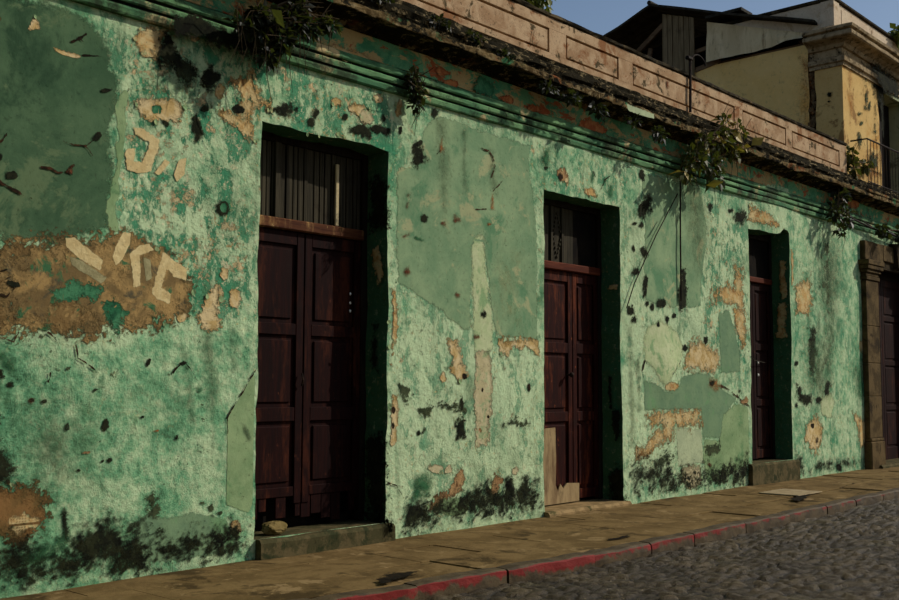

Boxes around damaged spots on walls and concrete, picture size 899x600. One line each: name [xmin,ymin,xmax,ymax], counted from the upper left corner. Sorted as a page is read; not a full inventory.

peeling [133,24,169,64]
peeling [131,92,188,125]
peeling [210,69,273,147]
water stain [367,170,392,234]
peeling [0,224,242,347]
peeling [682,335,720,375]
water stain [0,438,17,487]
water stain [362,423,544,538]
water stain [608,376,621,442]
peeling [634,405,704,464]
water stain [603,441,750,502]
water stain [0,490,251,590]